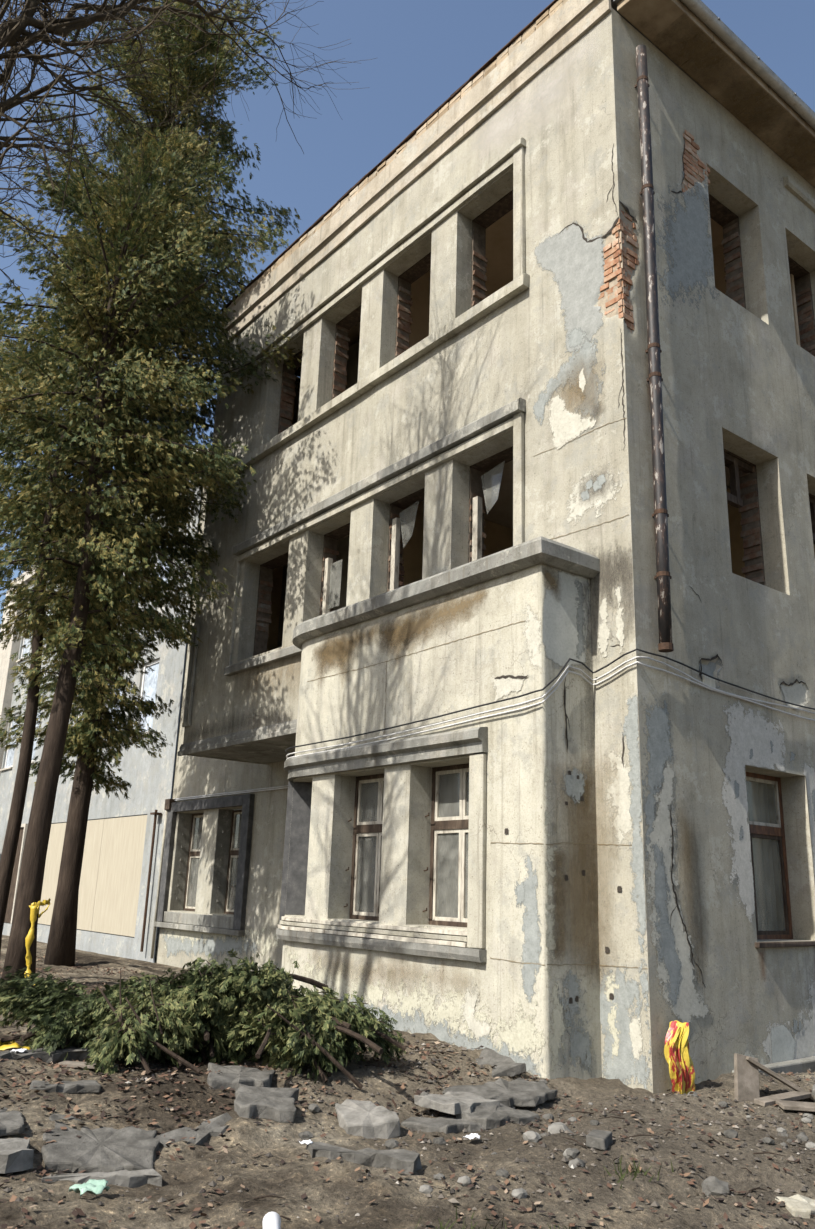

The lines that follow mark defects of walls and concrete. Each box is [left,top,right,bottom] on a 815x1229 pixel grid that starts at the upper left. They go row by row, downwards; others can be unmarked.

crack [607,143,618,216]
flaking render [671,130,710,194]
peeling [533,201,639,449]
spalling [778,679,809,708]
peeling [161,695,709,1090]
crack [670,807,705,986]
peeling [721,700,815,923]
peeling [744,948,815,1065]